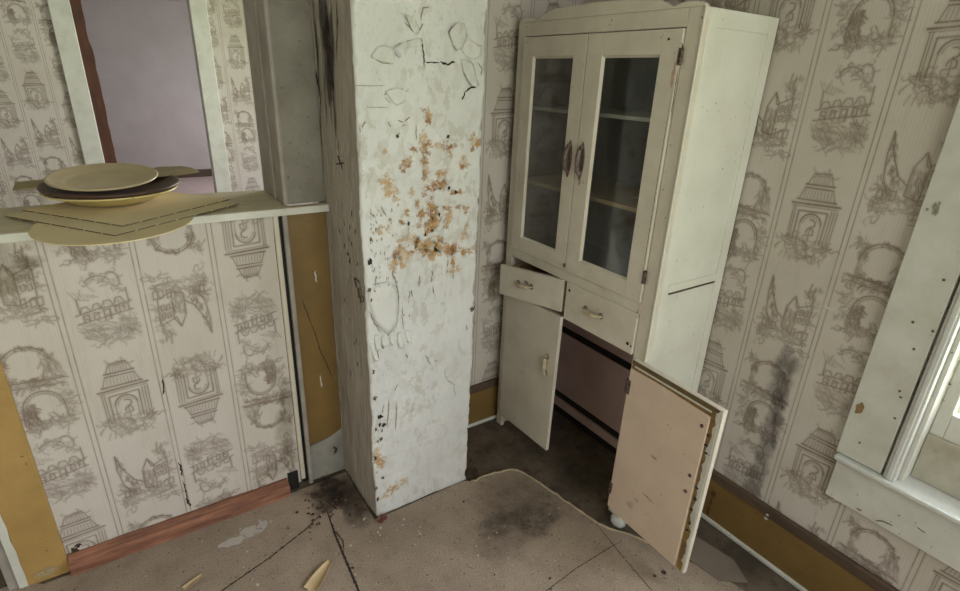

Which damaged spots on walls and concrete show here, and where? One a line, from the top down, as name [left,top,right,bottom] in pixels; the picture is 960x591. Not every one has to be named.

damp [313,3,336,129]
crack [422,44,455,66]
rust [376,110,472,274]